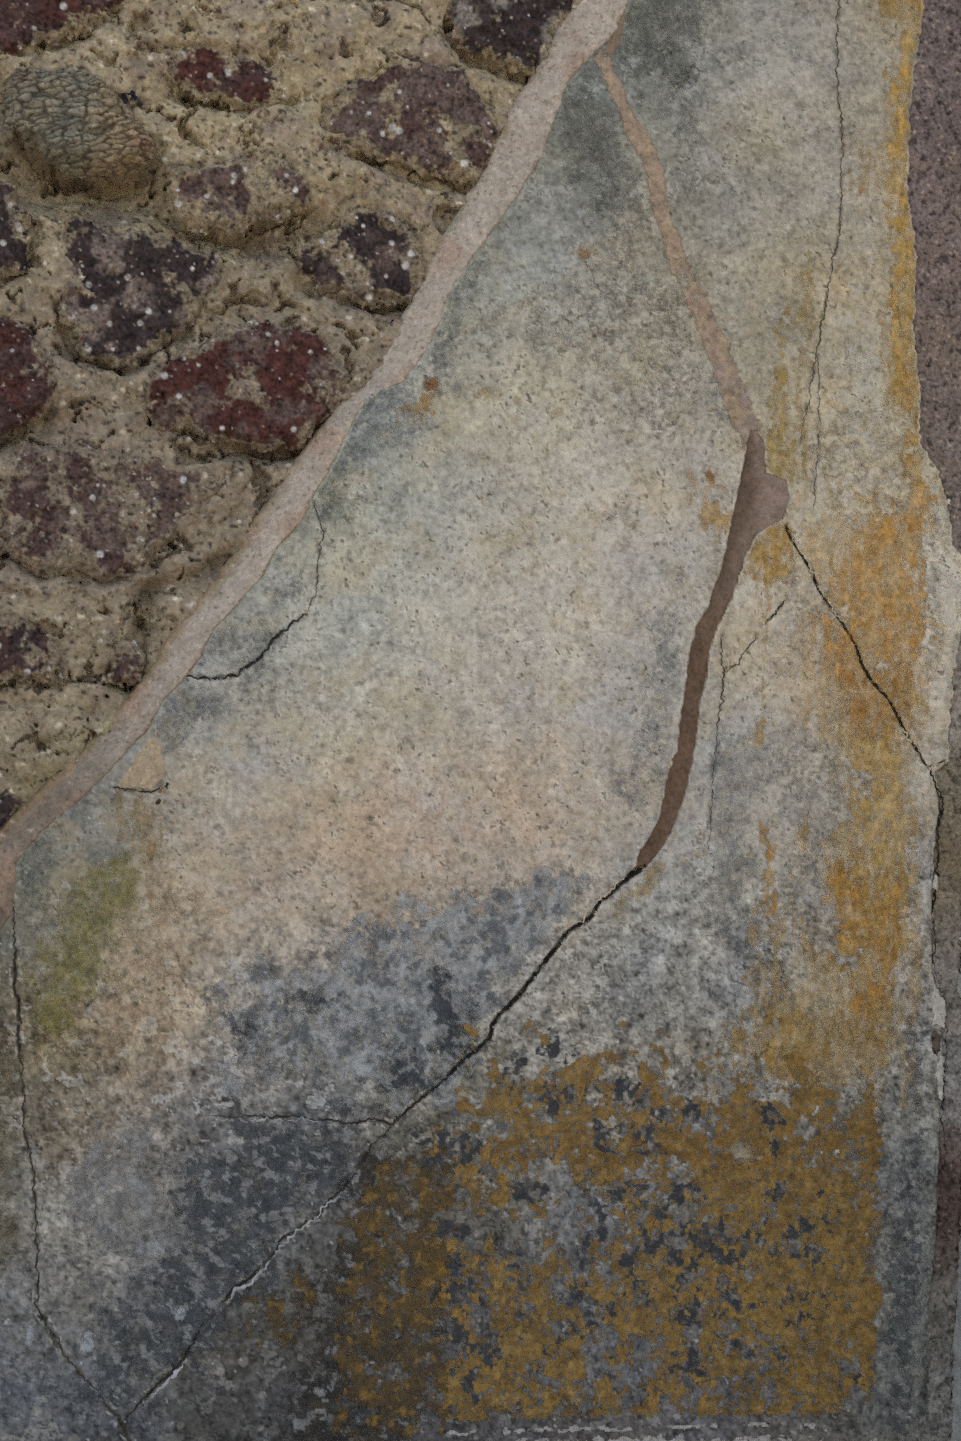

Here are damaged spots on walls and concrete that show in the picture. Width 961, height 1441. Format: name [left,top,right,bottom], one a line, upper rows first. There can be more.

crack [187,503,324,681]
crack [212,0,947,1160]
crack [113,785,162,793]
crack [12,901,359,1441]
crack [937,1016,948,1231]
crack [948,1171,961,1416]